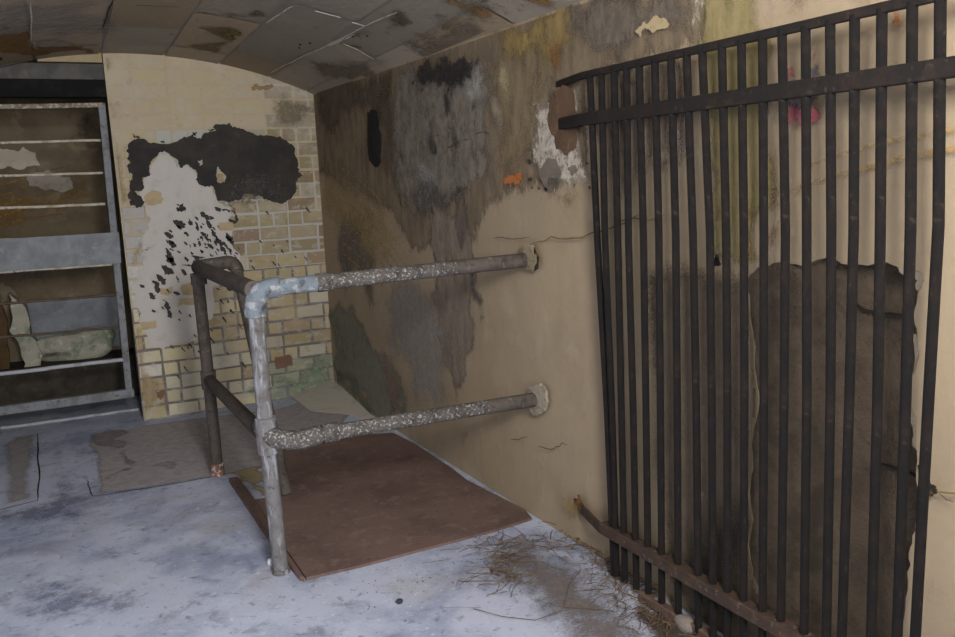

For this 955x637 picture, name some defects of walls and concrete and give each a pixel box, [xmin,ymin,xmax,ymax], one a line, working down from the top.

peeling [566,0,687,55]
leakage [272,0,706,272]
peeling [527,85,590,193]
peeling [126,123,302,349]
spalling [275,353,293,369]
leakage [430,273,482,392]
crack [0,433,41,510]
spalling [748,259,925,637]